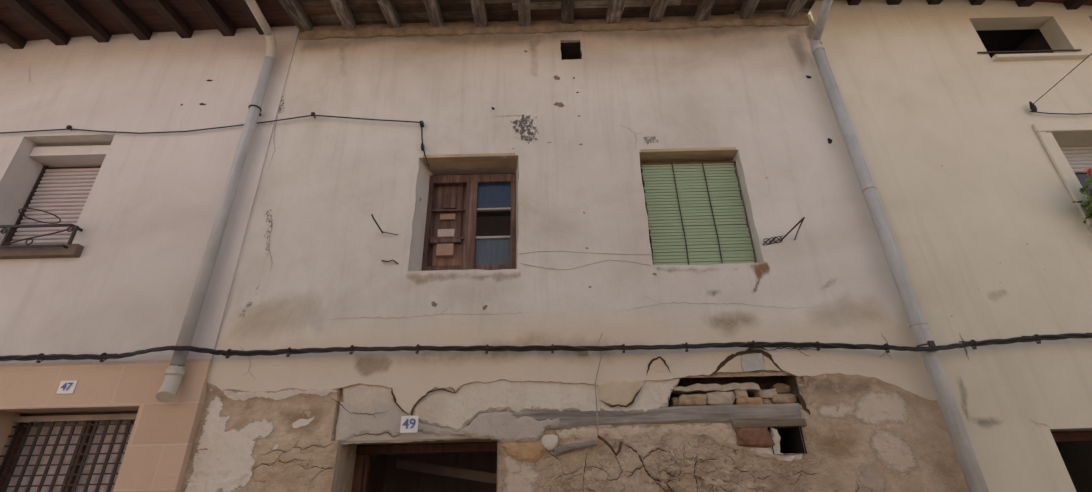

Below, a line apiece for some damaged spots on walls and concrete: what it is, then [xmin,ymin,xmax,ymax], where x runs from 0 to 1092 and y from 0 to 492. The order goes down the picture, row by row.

rust [754,263,769,277]
spalling [180,356,970,492]
crack [546,445,816,492]